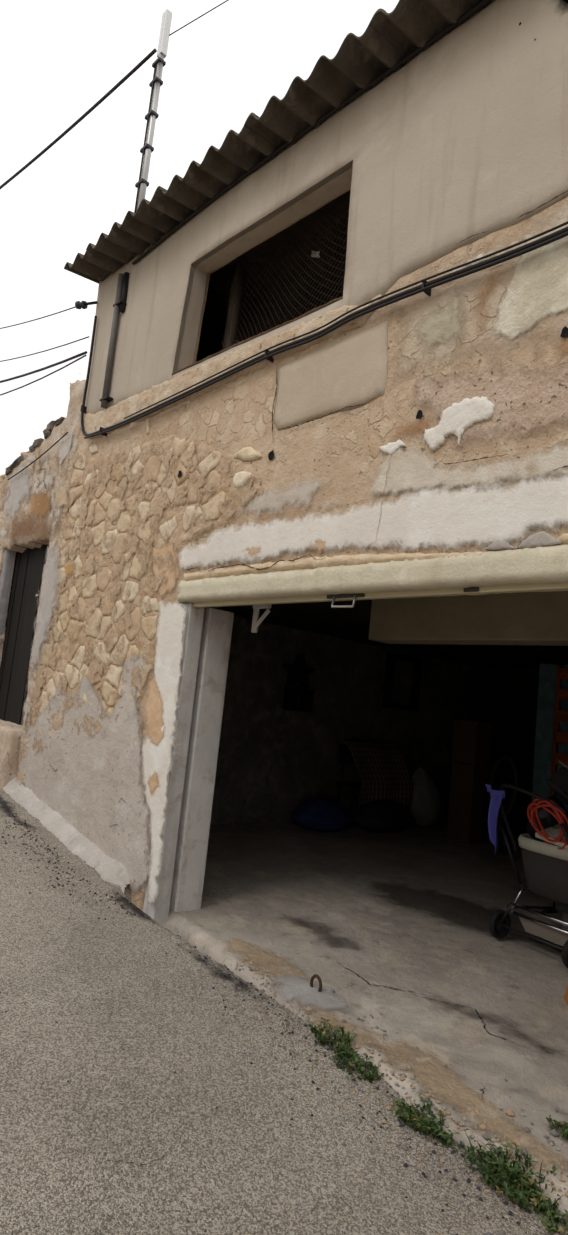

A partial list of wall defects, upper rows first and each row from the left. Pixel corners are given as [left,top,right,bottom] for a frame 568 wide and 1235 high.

spalling [478,224,568,340]
spalling [416,297,464,347]
peeling [379,439,406,455]
peeling [416,396,495,451]
spalling [485,531,564,551]
spalling [24,419,274,753]
spalling [148,773,159,794]